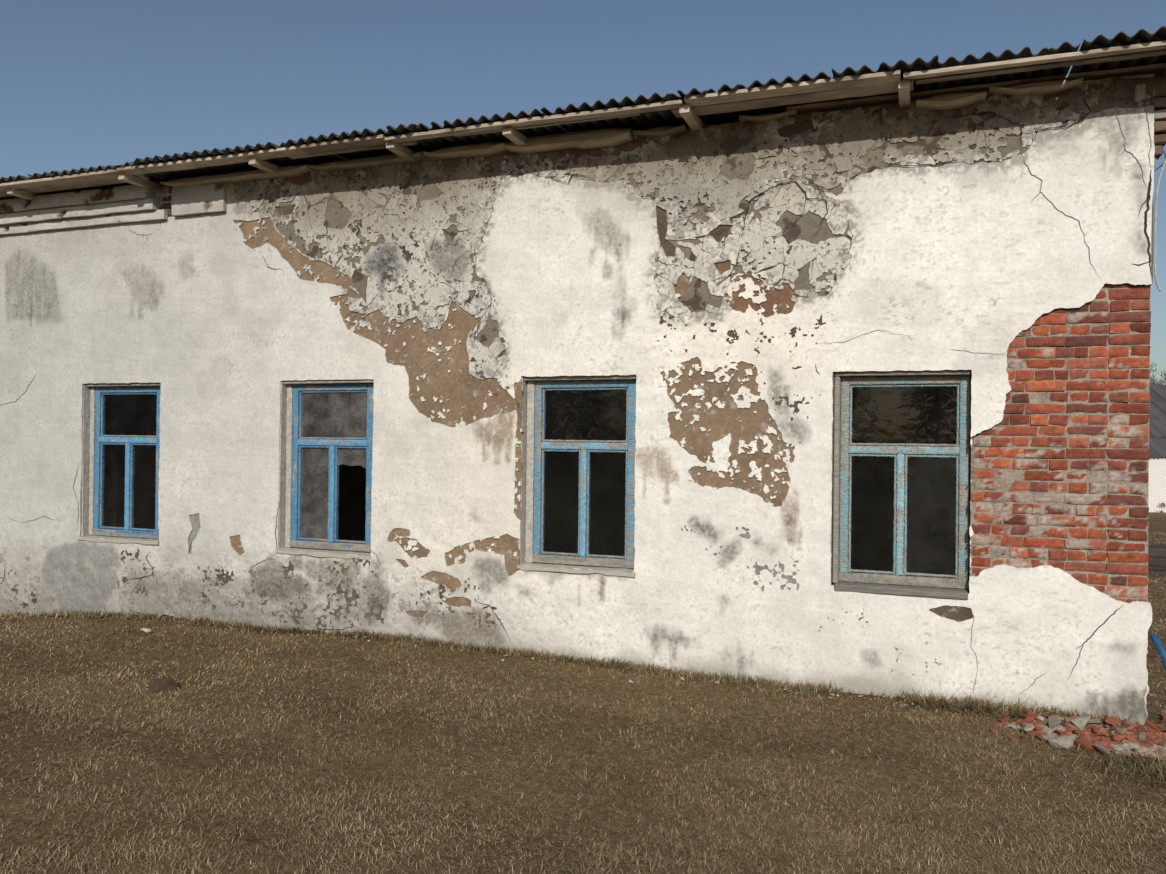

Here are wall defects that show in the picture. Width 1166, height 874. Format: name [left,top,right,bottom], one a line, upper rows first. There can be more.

crack [694,159,971,284]
crack [927,91,1152,281]
peeling [233,77,1154,520]
flaking render [970,283,1151,603]
damp [251,556,359,599]
peeling [388,526,520,629]
damp [478,559,506,587]
crack [1024,605,1123,691]